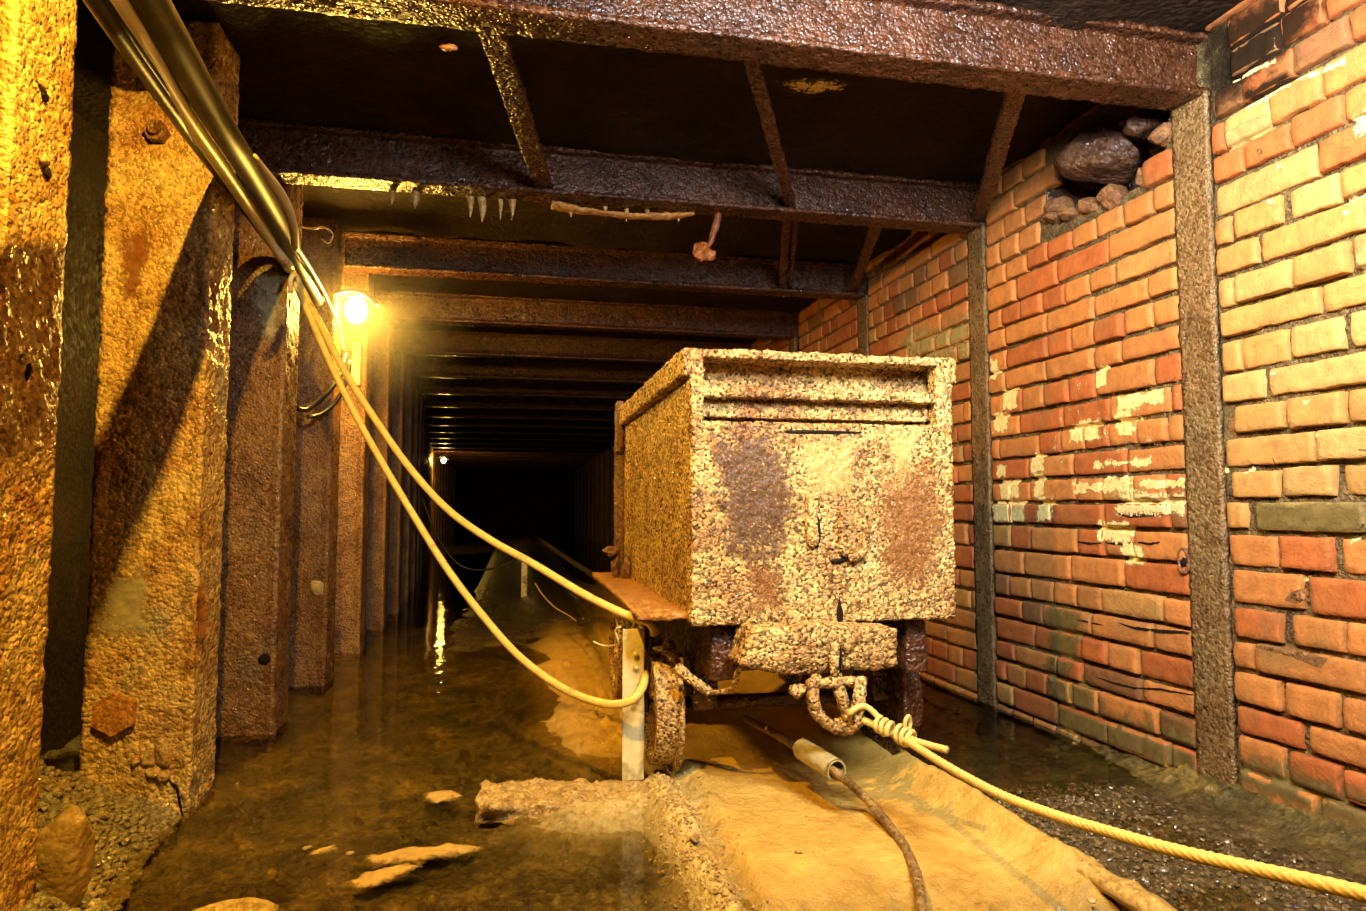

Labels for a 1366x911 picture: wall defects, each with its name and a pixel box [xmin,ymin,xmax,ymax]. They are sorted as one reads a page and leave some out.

leakage [1351,109,1366,137]
rust [121,231,148,295]
leakage [990,359,1186,565]